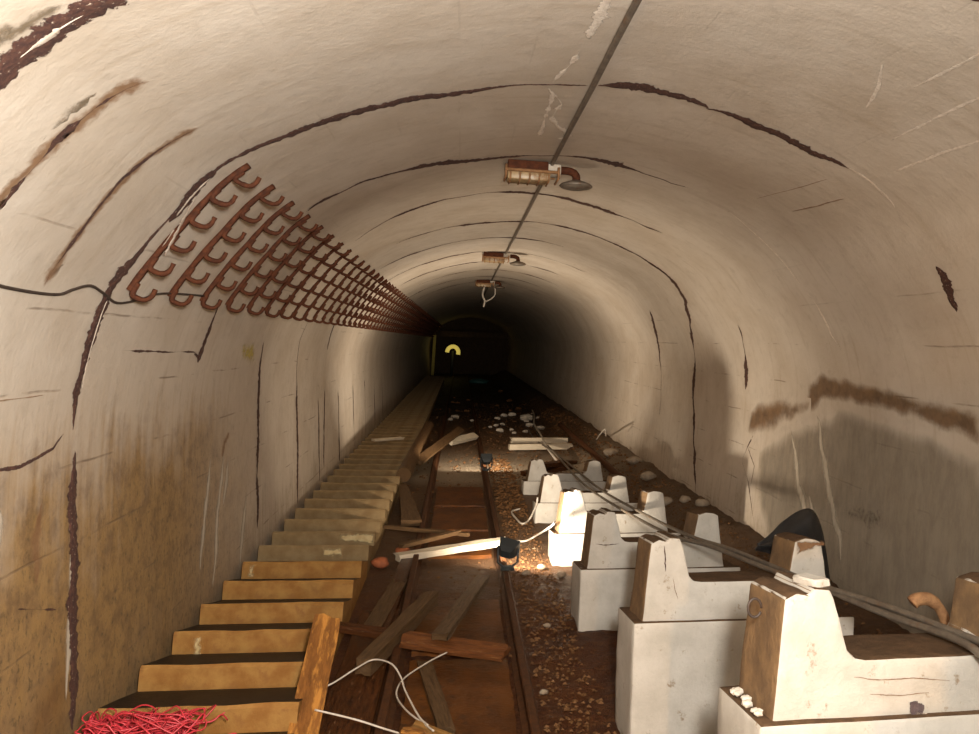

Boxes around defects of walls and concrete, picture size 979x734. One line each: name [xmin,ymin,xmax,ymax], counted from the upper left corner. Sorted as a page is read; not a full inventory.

crack [0,0,128,90]
crack [866,64,883,108]
crack [915,52,979,87]
crack [0,82,979,527]
crack [19,452,81,730]
water stain [746,369,979,634]